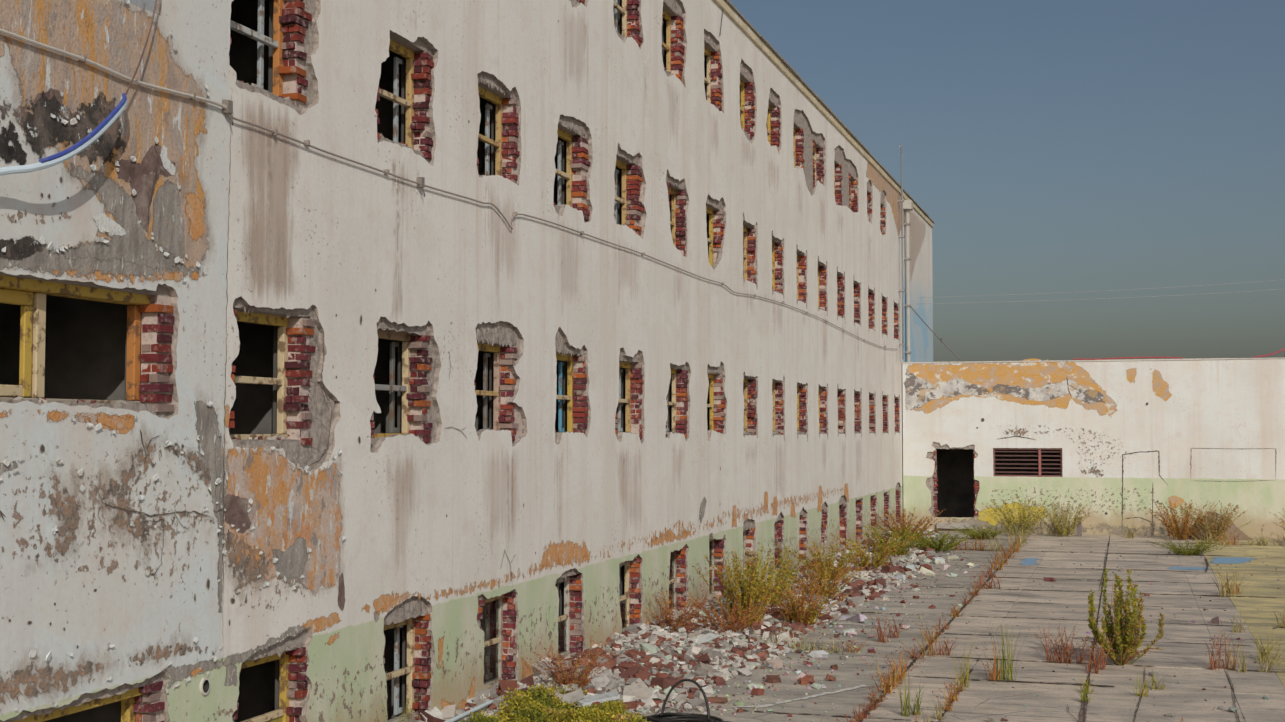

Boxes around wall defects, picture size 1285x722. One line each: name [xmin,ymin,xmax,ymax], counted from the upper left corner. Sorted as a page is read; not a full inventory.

peeling [0,0,210,434]
peeling [743,358,1117,436]
peeling [1126,368,1172,405]
peeling [0,298,347,626]
flaking render [926,442,978,518]
peeling [974,425,1187,517]
flaking render [374,483,900,722]
flaking render [0,625,387,722]